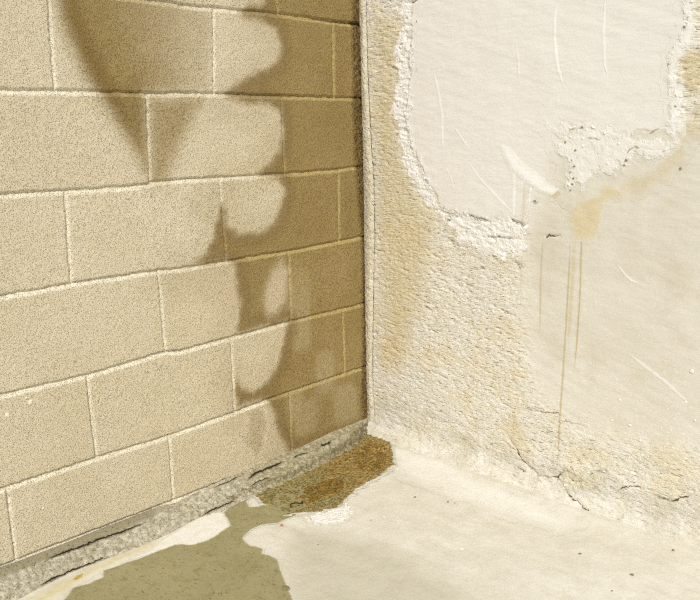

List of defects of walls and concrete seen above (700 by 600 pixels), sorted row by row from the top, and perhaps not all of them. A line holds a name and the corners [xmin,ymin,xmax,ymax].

peeling [389,0,533,268]
spalling [531,0,700,210]
water stain [43,0,369,559]
crack [33,520,147,589]
crack [201,500,235,516]
crack [510,406,606,514]
spalling [557,466,609,493]
crack [618,485,689,502]